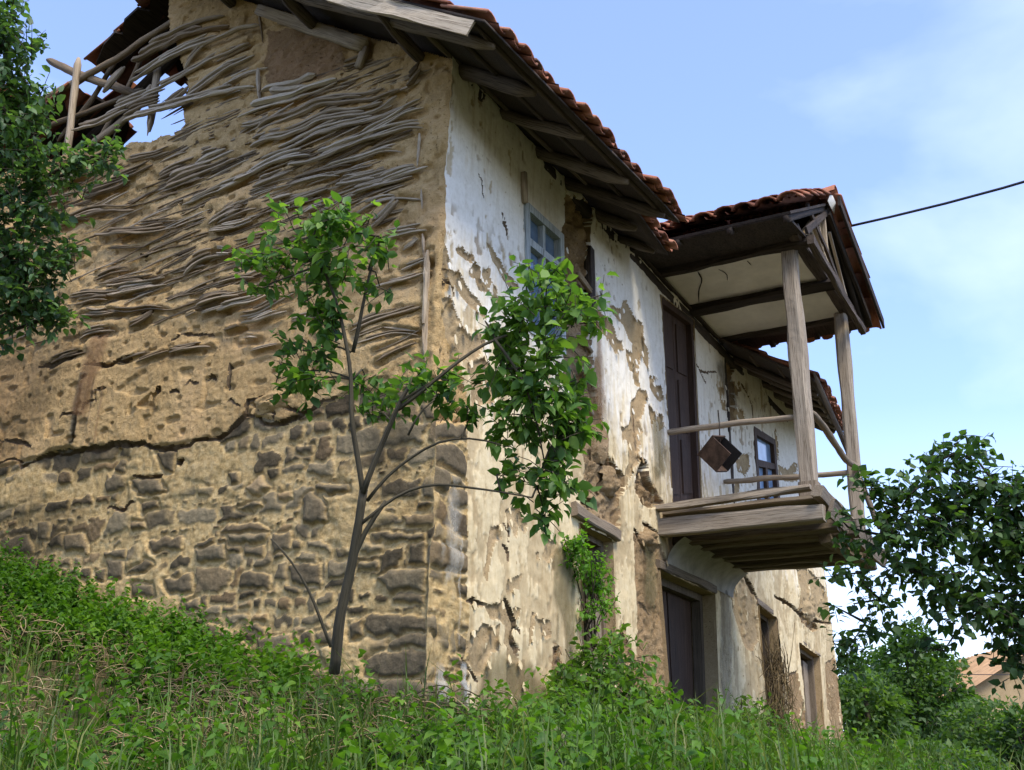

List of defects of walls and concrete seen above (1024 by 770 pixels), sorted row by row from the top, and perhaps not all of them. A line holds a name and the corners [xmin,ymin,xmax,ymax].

spalling [561,194,594,305]
flaking render [436,242,520,426]
crack [0,362,339,513]
spalling [563,300,666,538]
flaking render [483,507,528,581]
flaking render [465,573,565,704]